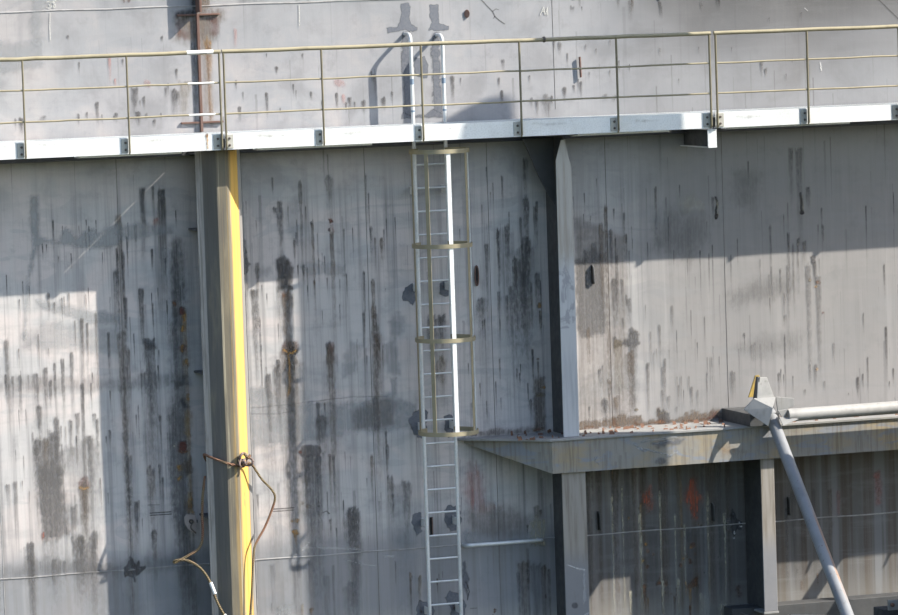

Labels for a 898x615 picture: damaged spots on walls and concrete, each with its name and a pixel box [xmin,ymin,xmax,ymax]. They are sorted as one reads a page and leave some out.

leakage [140,187,176,222]
leakage [484,226,509,269]
leakage [506,198,541,309]
leakage [576,245,617,337]
leakage [128,339,159,376]
corrosion [170,244,193,585]
corrosion [266,343,297,414]
leakage [614,328,639,400]
corrosion [579,408,722,430]
leakage [32,406,98,569]